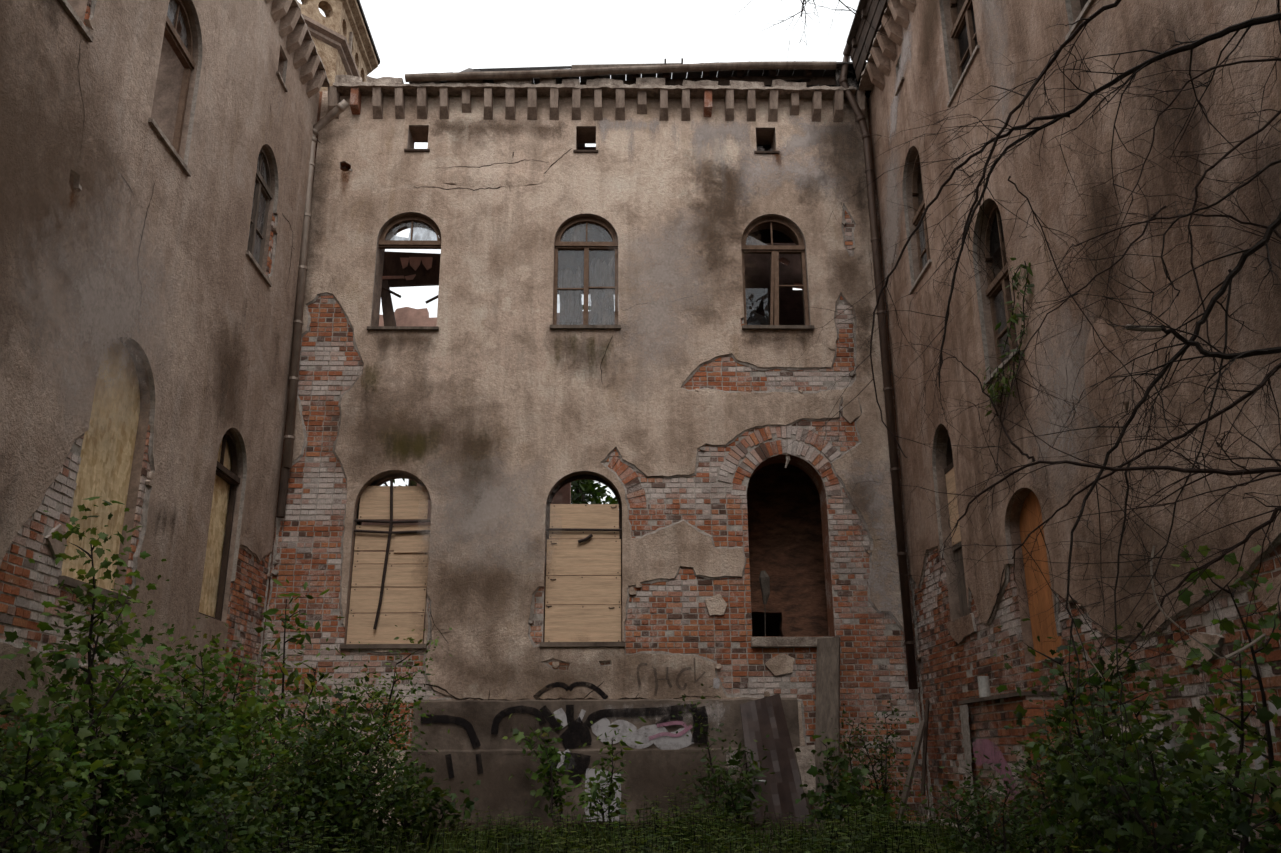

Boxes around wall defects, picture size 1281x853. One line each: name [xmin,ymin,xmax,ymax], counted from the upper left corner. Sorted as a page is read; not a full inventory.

crack [416,148,572,191]
flaking render [0,423,156,678]
flaking render [220,293,454,770]
water stain [358,404,491,505]
flaking render [599,292,1281,853]